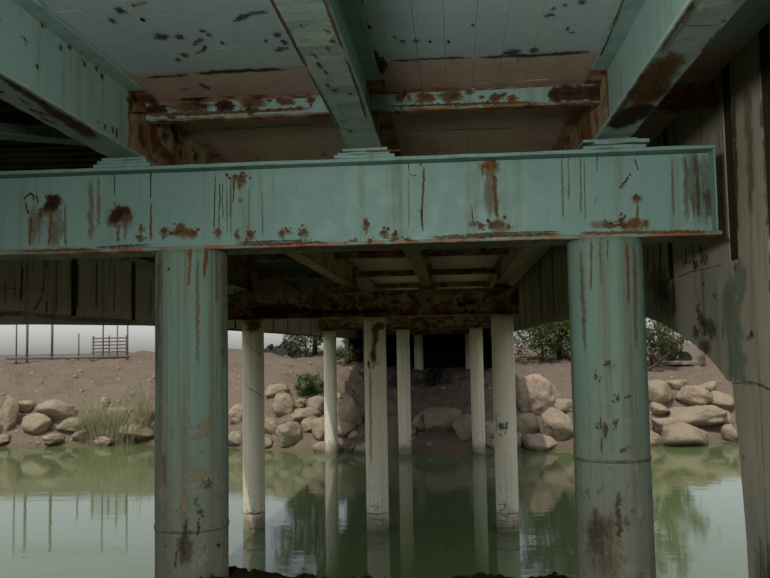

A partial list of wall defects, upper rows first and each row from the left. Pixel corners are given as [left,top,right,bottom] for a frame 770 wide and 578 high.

corrosion [126,0,367,165]
corrosion [389,87,535,110]
corrosion [607,1,696,129]
damp [759,66,770,237]
corrosion [20,192,149,253]
corrosion [161,223,200,239]
corrosion [434,160,563,239]
corrosion [580,194,705,288]
damp [589,492,623,553]